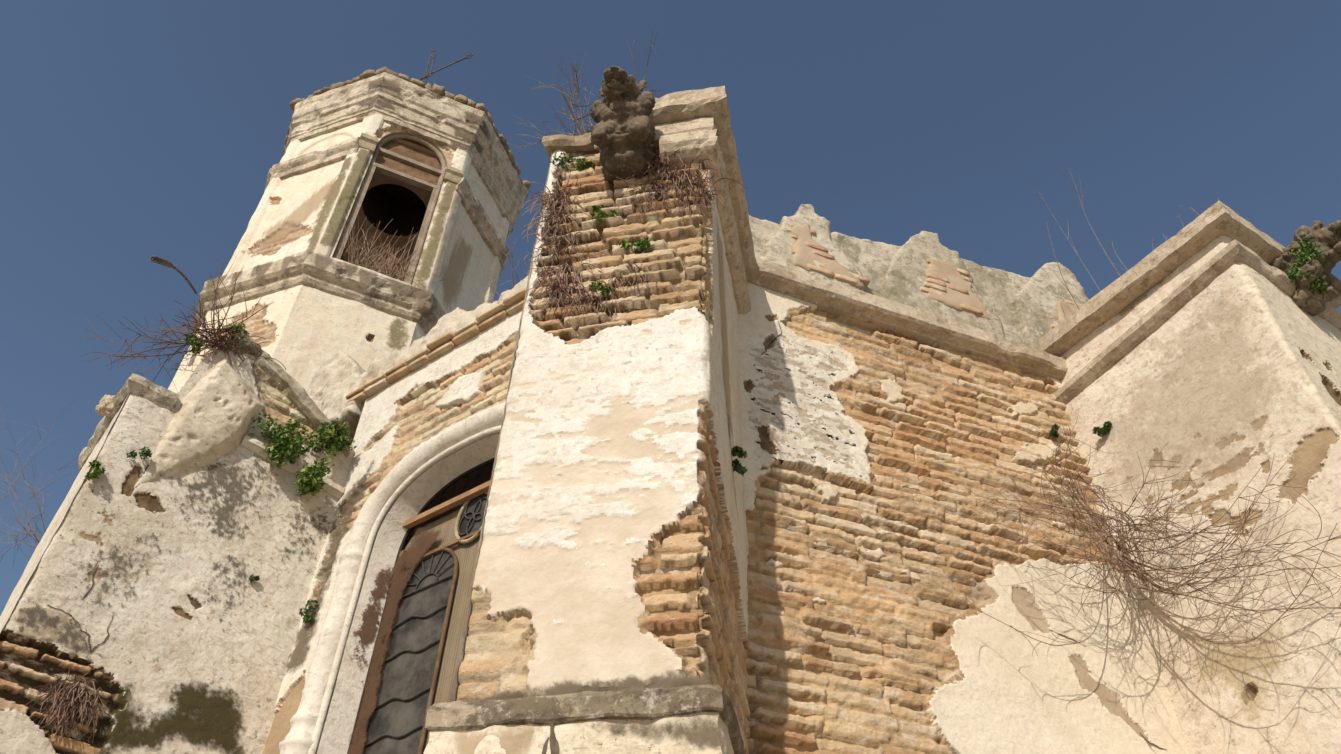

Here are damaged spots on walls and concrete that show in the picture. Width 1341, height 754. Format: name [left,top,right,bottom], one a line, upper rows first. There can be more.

flaking render [247,224,314,258]
flaking render [528,143,714,364]
flaking render [786,222,870,289]
flaking render [920,258,991,320]
flaking render [200,302,279,360]
flaking render [1299,347,1341,406]
flaking render [121,465,166,514]
peeling [1145,415,1270,537]
flaking render [1276,427,1340,504]
flaking render [311,305,1124,754]
flaking render [0,606,127,754]